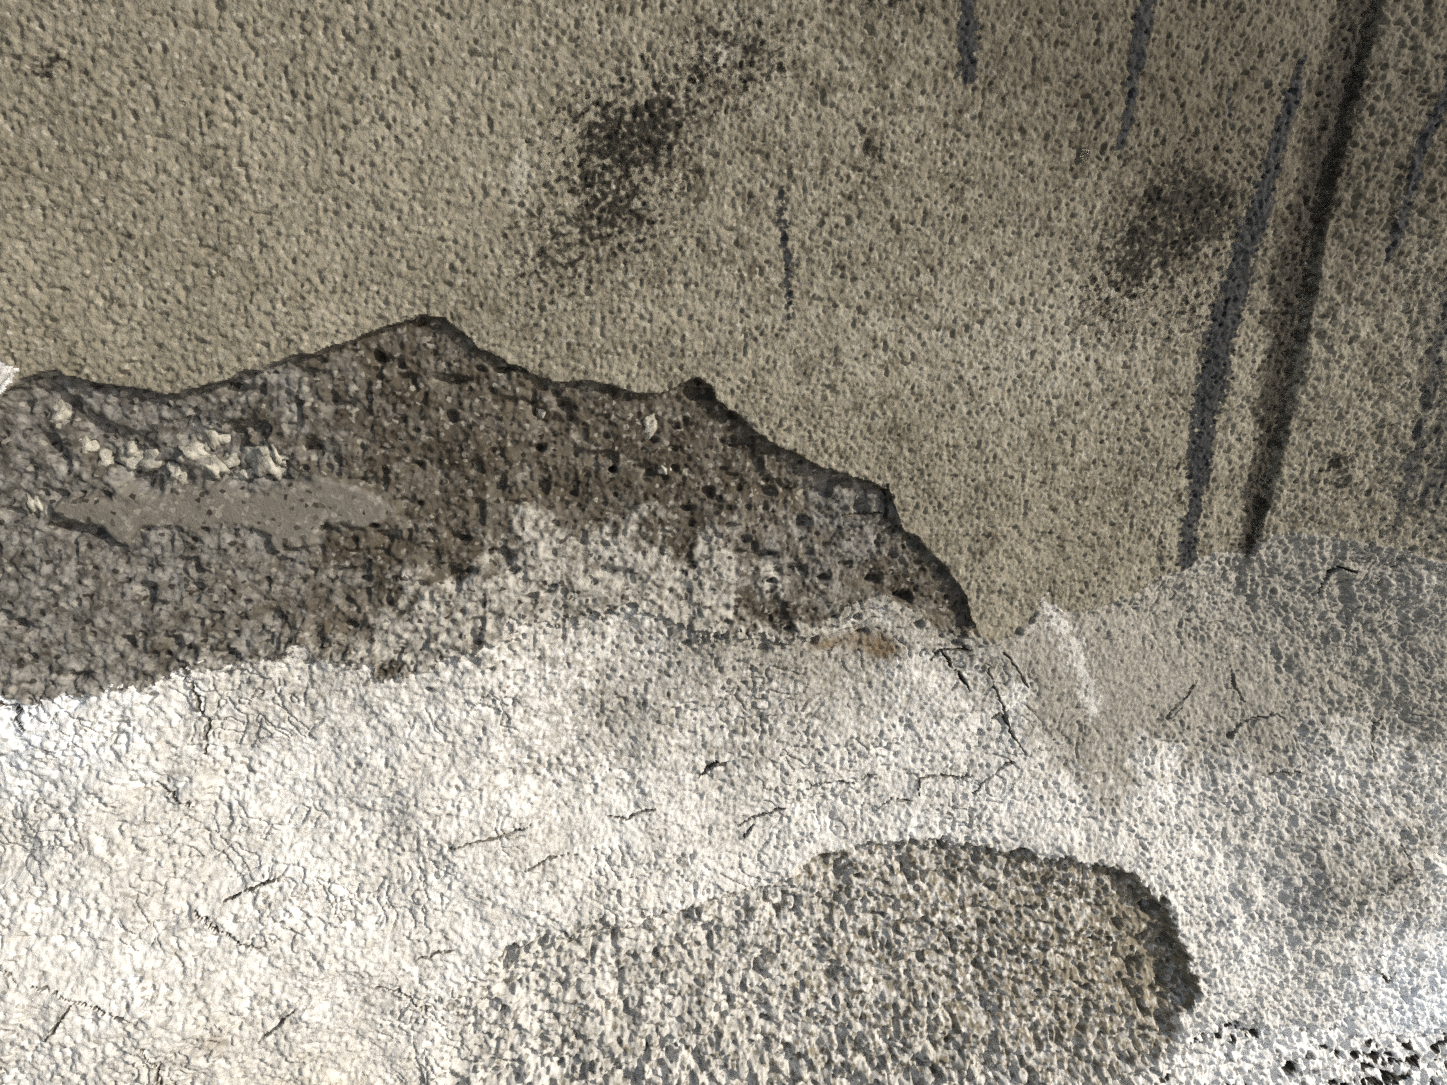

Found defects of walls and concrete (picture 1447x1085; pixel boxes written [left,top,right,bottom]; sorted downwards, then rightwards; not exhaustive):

damp [501,10,800,320]
damp [1384,73,1447,265]
damp [1070,0,1379,582]
damp [1389,283,1447,550]
crack [448,824,531,852]
crack [527,852,578,871]
crack [607,808,655,821]
spalling [0,314,1447,1085]
crack [736,645,1029,839]